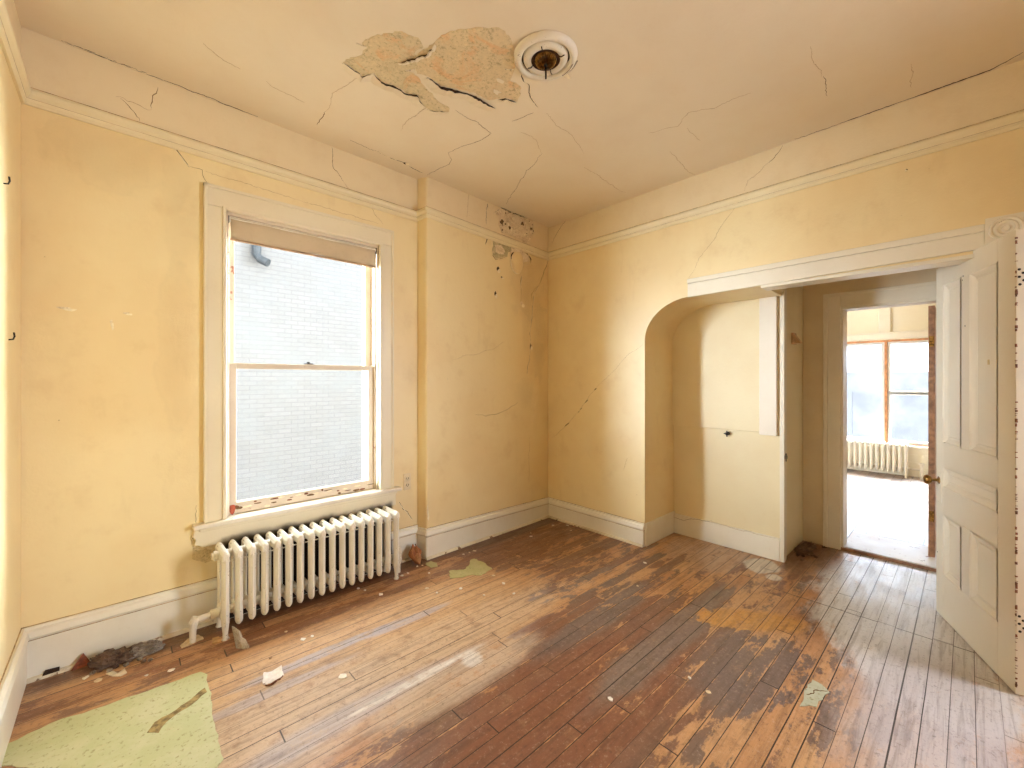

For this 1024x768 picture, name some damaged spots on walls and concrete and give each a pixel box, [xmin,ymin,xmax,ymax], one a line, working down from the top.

crack [61,40,258,120]
flaking render [341,27,521,115]
crack [332,111,490,188]
crack [467,75,617,242]
crack [691,52,1023,274]
flaking render [491,206,535,279]
flaking render [190,538,216,563]